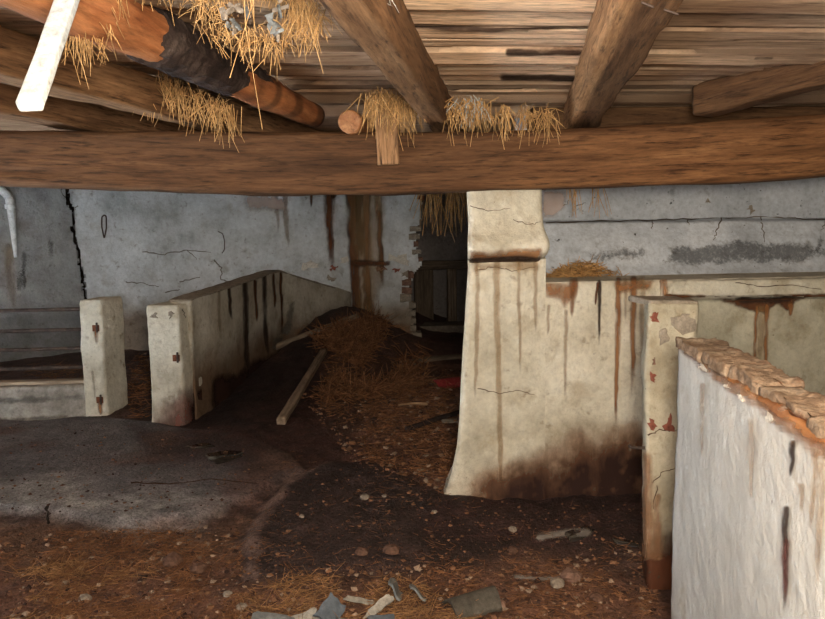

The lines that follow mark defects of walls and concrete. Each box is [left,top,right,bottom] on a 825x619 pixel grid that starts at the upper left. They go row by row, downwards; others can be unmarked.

crack [61,189,87,299]
damp [212,272,283,408]
spalling [375,226,423,337]
corrosion [546,280,578,314]
corrosion [615,277,650,412]
spalling [649,312,697,345]
corrosion [722,296,804,360]
damp [159,390,202,426]
spalling [647,413,675,432]
peeling [678,348,825,459]
damp [471,426,672,590]